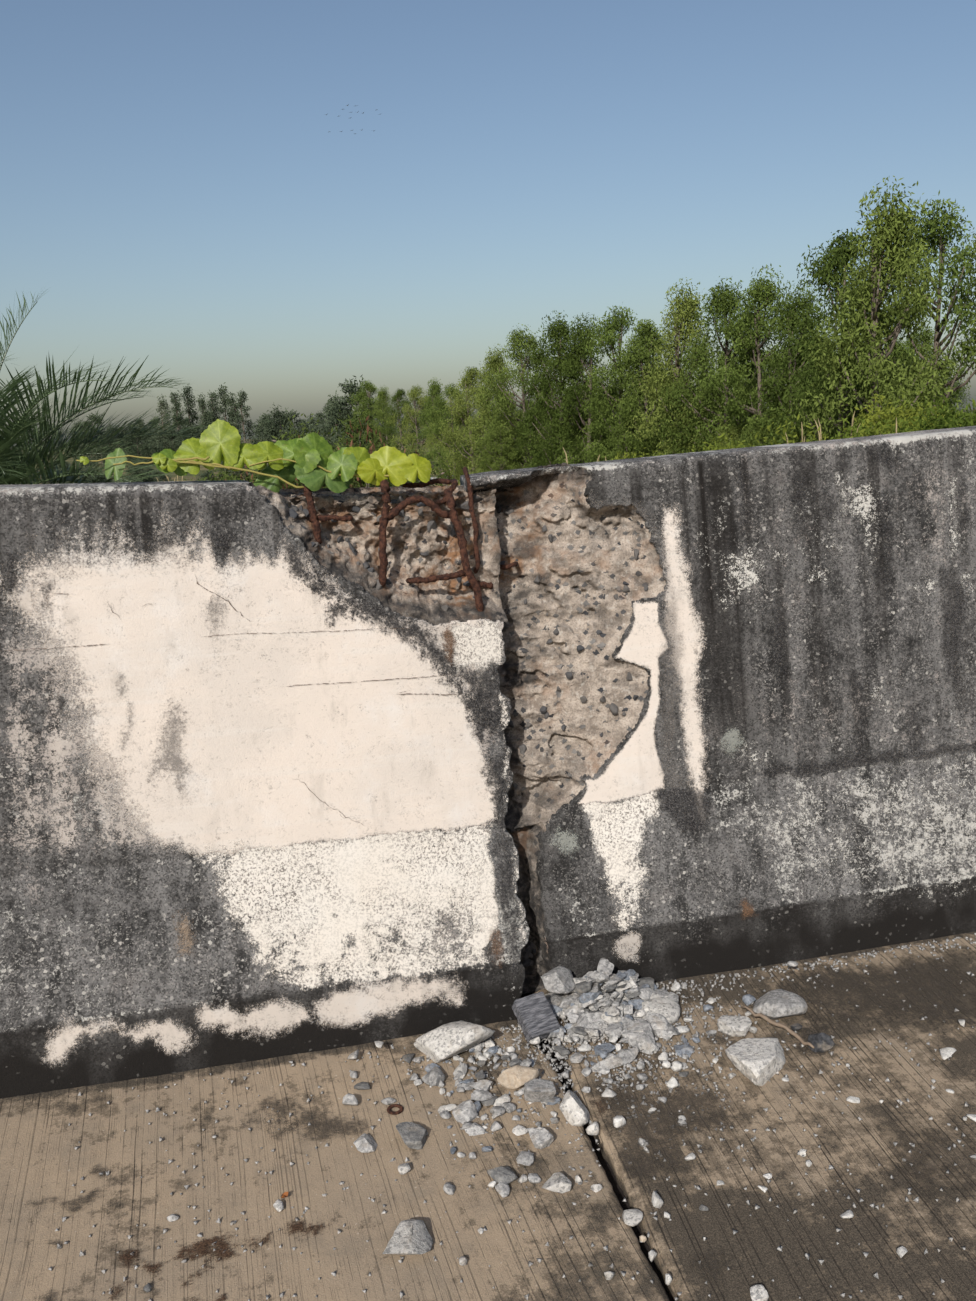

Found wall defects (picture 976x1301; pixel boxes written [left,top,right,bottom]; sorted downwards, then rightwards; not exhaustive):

water stain [4,554,17,591]
rust [302,483,353,544]
rust [378,467,493,612]
water stain [937,566,975,717]
water stain [148,702,187,791]
peeling [7,463,710,1063]
water stain [280,528,527,976]
water stain [656,788,711,836]
water stain [762,670,976,779]
crack [507,805,551,994]
crack [536,1038,573,1092]
crack [583,1124,674,1301]